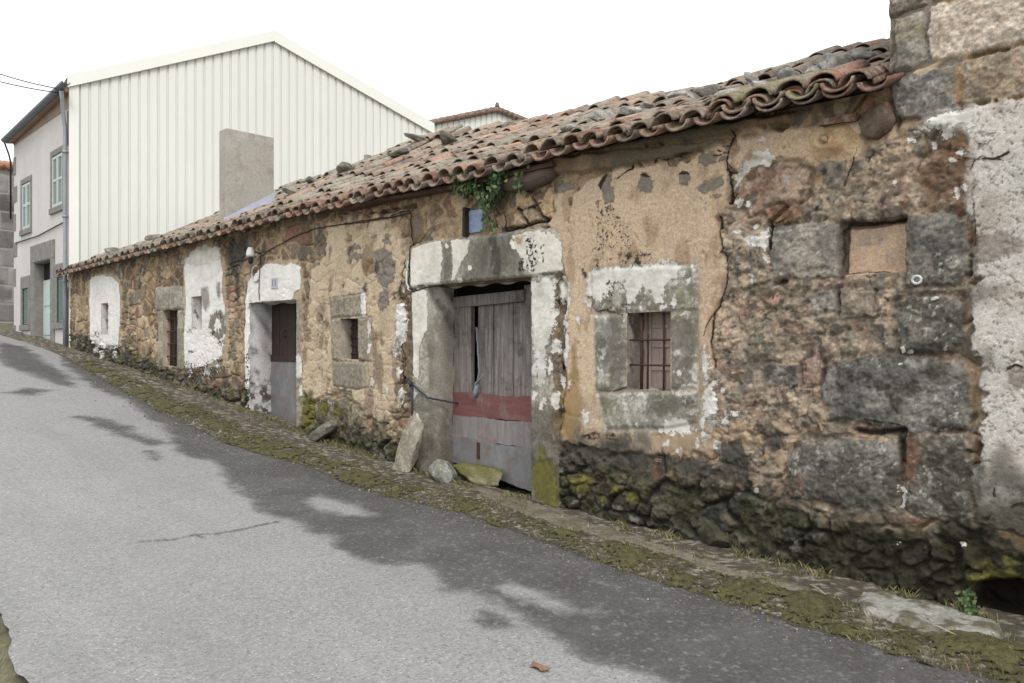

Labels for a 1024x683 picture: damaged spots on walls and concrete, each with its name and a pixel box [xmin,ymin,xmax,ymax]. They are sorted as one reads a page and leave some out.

peeling [182,244,226,378]
peeling [510,172,695,445]
crack [617,131,736,366]
flaking render [732,224,773,263]
spalling [802,159,848,216]
peeling [907,110,976,150]
flaking render [638,345,828,481]
water stain [0,338,1008,683]